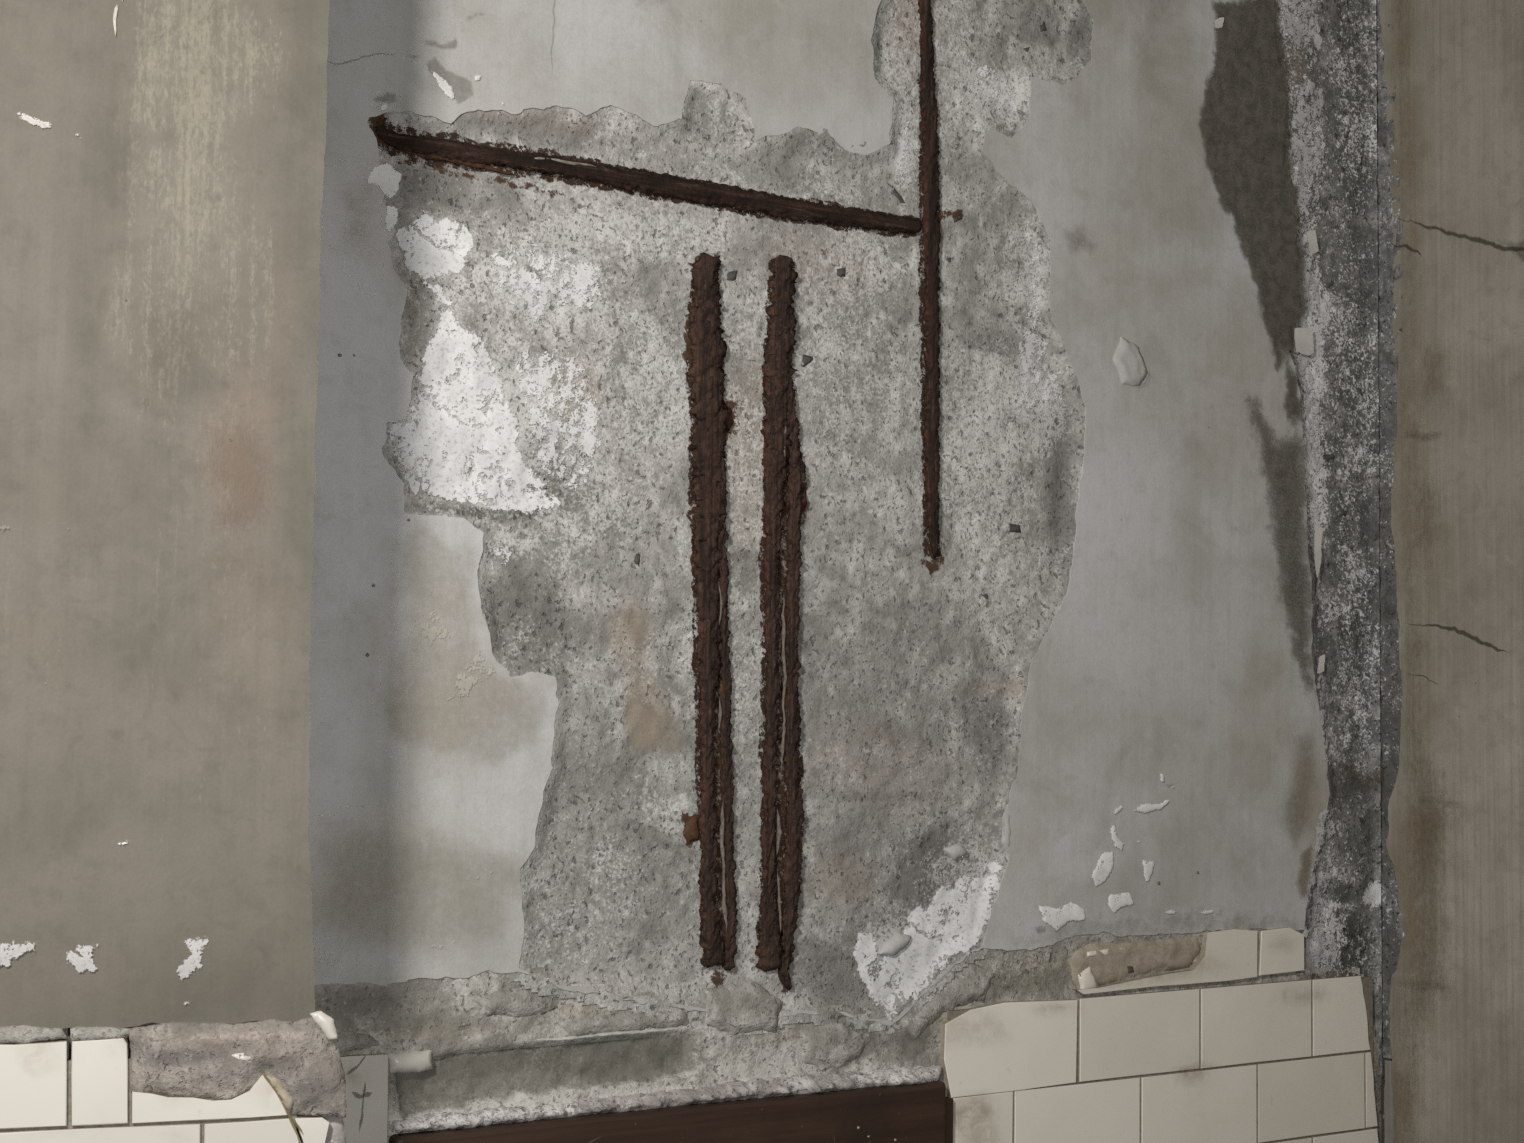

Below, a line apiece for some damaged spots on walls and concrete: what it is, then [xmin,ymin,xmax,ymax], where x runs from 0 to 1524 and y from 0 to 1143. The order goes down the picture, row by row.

spalling [128,1011,347,1143]
rust [368,0,964,575]
rust [680,252,810,995]
spalling [314,0,1405,1143]
water stain [1199,0,1344,765]
water stain [1300,808,1338,971]
crack [1391,218,1524,255]
crack [1409,624,1509,653]